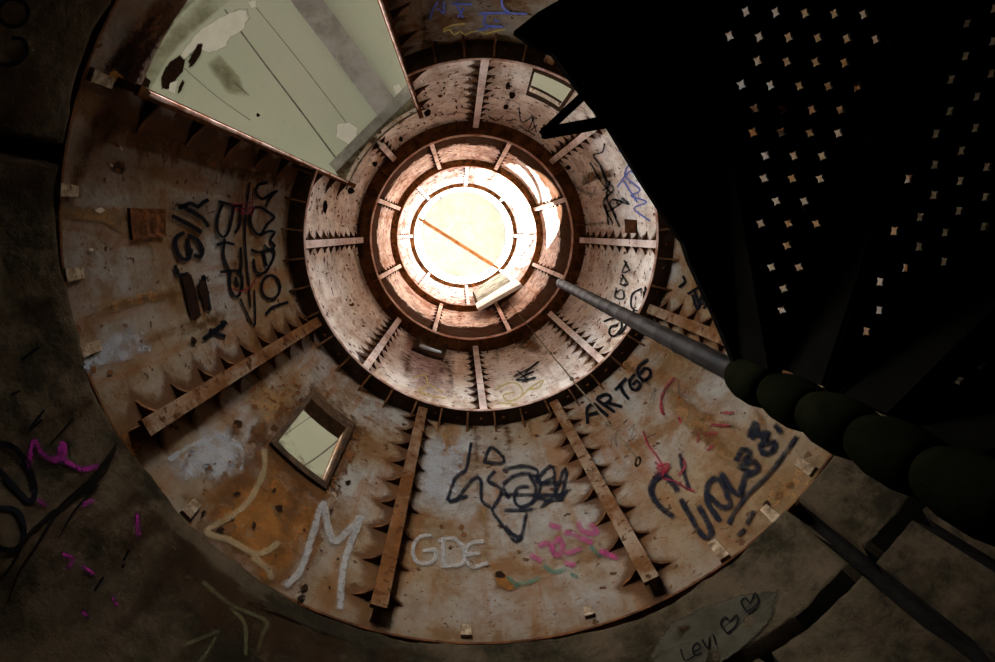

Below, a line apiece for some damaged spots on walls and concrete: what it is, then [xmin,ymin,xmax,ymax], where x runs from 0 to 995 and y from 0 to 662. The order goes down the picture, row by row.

peeling [142,0,256,94]
peeling [336,122,358,144]
corrosion [204,386,361,585]